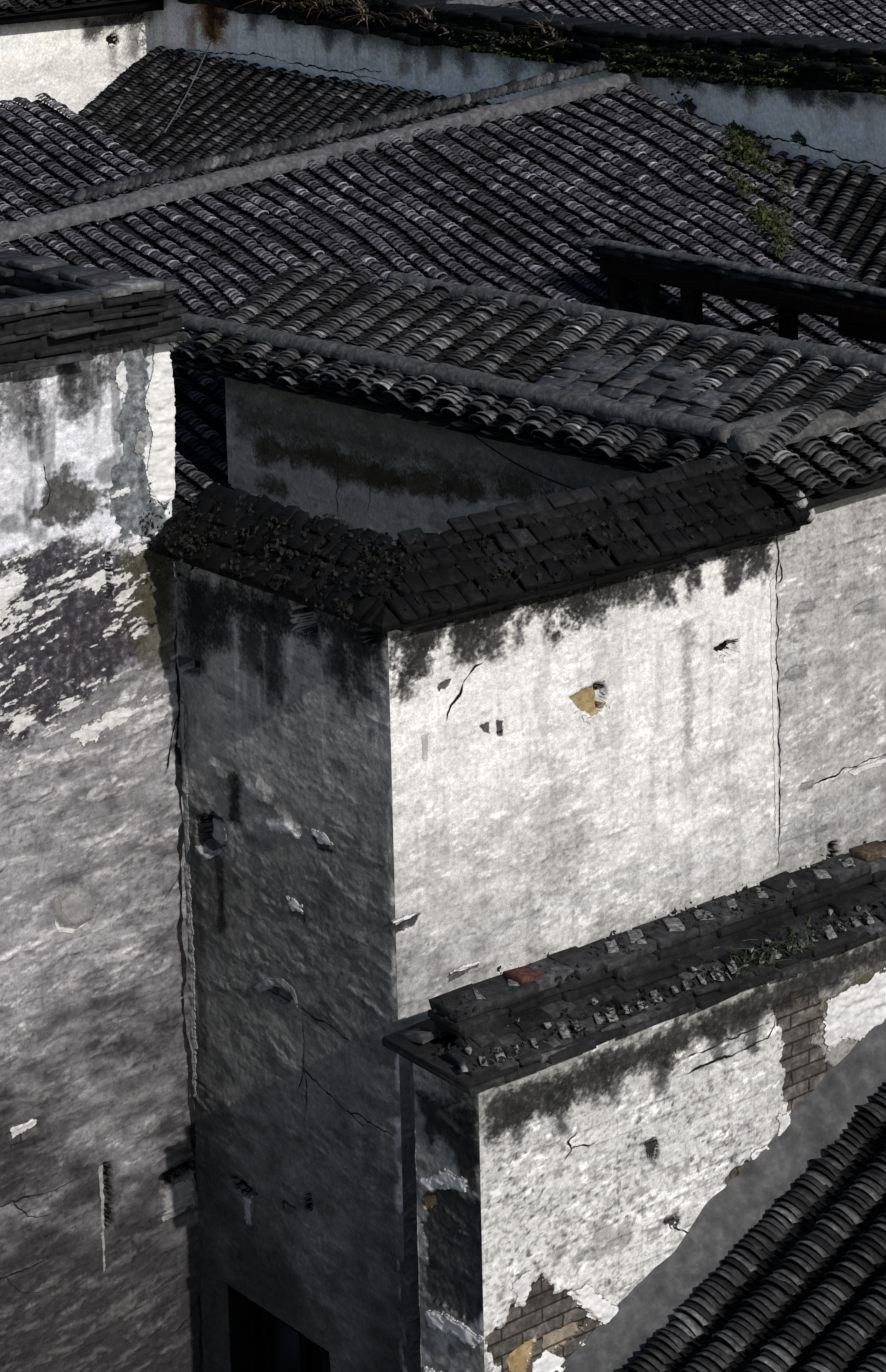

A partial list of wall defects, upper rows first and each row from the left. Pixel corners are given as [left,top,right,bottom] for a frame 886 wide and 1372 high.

rust [197,4,229,47]
leakage [652,64,885,109]
leakage [120,536,784,713]
spalling [570,682,614,724]
crack [769,538,886,865]
crack [165,620,198,1194]
crack [294,1005,392,1135]
leakage [416,937,886,1190]
spalling [419,1168,618,1372]